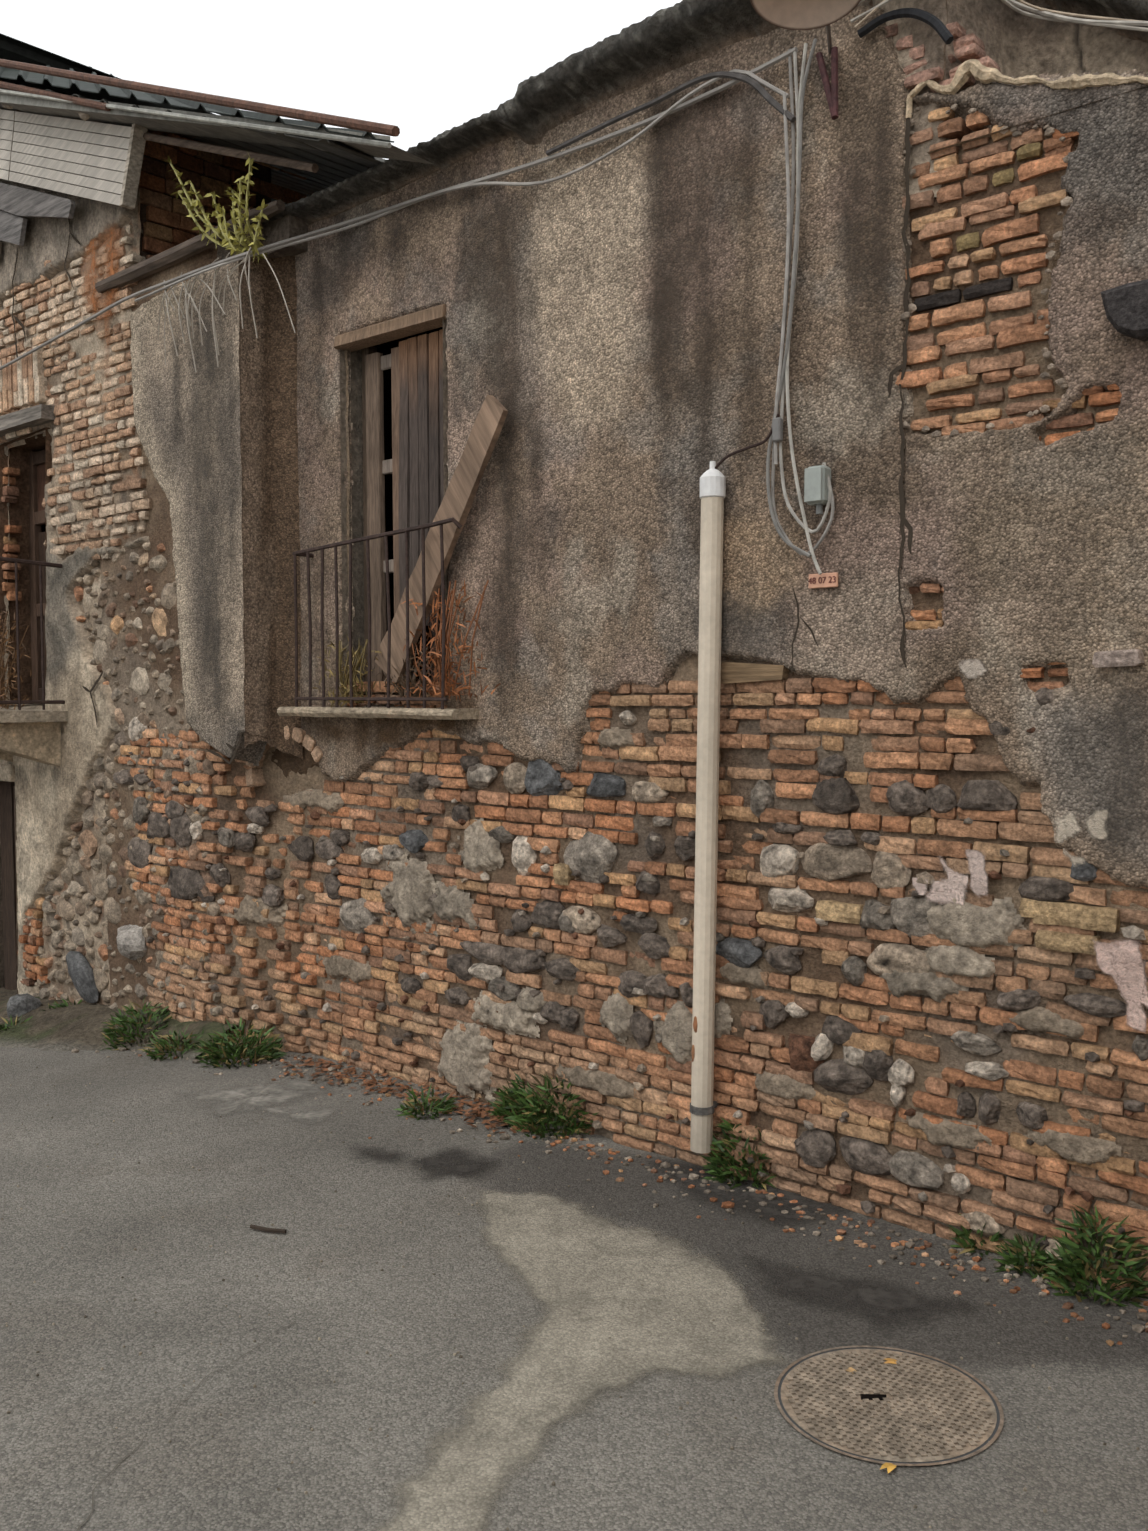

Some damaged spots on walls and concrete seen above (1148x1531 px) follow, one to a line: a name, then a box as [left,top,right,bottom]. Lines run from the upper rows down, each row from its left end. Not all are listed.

leakage [653,100,706,473]
crack [888,118,913,667]
spalling [885,22,1148,446]
spalling [0,225,1148,1297]